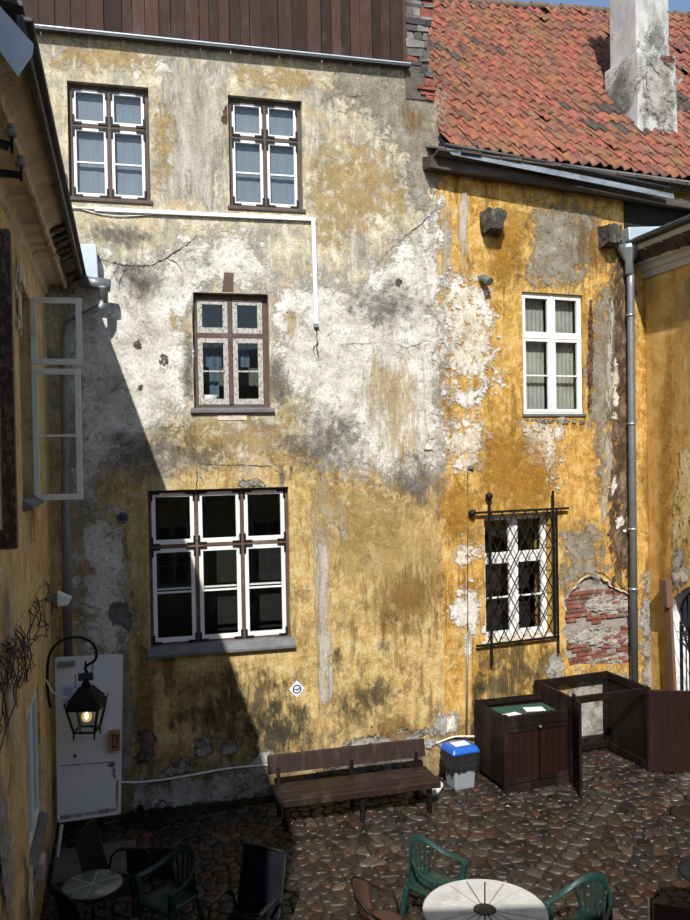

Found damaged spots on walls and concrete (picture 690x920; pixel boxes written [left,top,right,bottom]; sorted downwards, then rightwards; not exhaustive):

crack [100,237,196,290]
peeling [57,59,510,658]
water stain [605,240,647,597]
water stain [660,283,690,579]
peeling [670,440,690,593]
spalling [545,569,651,688]
mould [169,671,312,756]